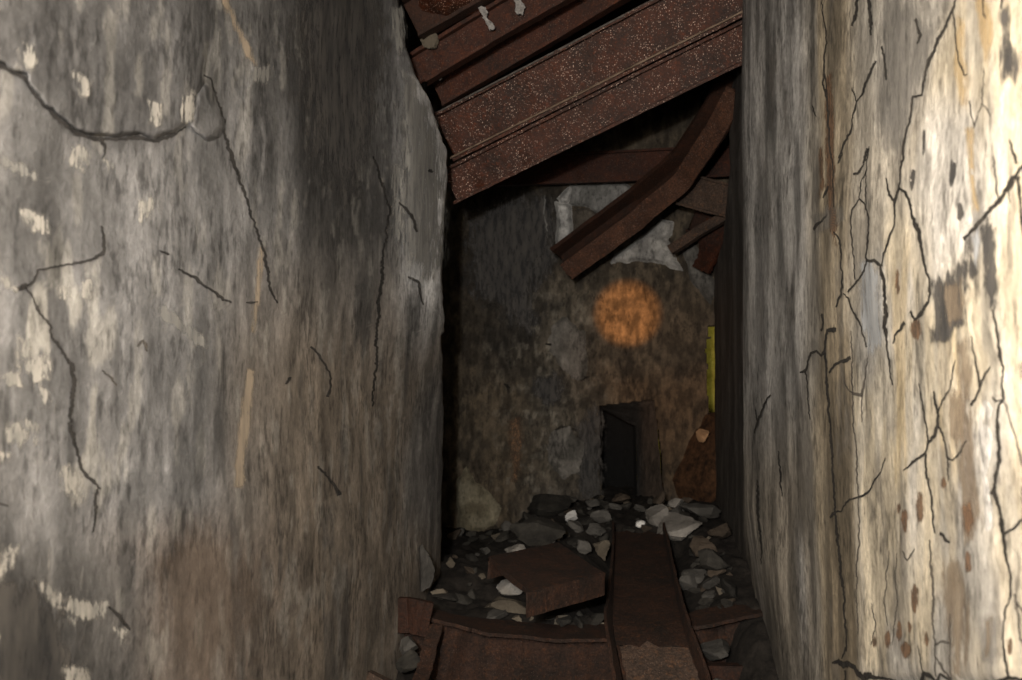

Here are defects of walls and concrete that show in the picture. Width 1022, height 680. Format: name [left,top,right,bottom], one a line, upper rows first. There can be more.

crack [0,62,187,159]
crack [160,74,278,304]
crack [13,225,106,532]
crack [800,0,1022,680]
corrosion [872,585,918,658]
corrosion [897,492,923,532]